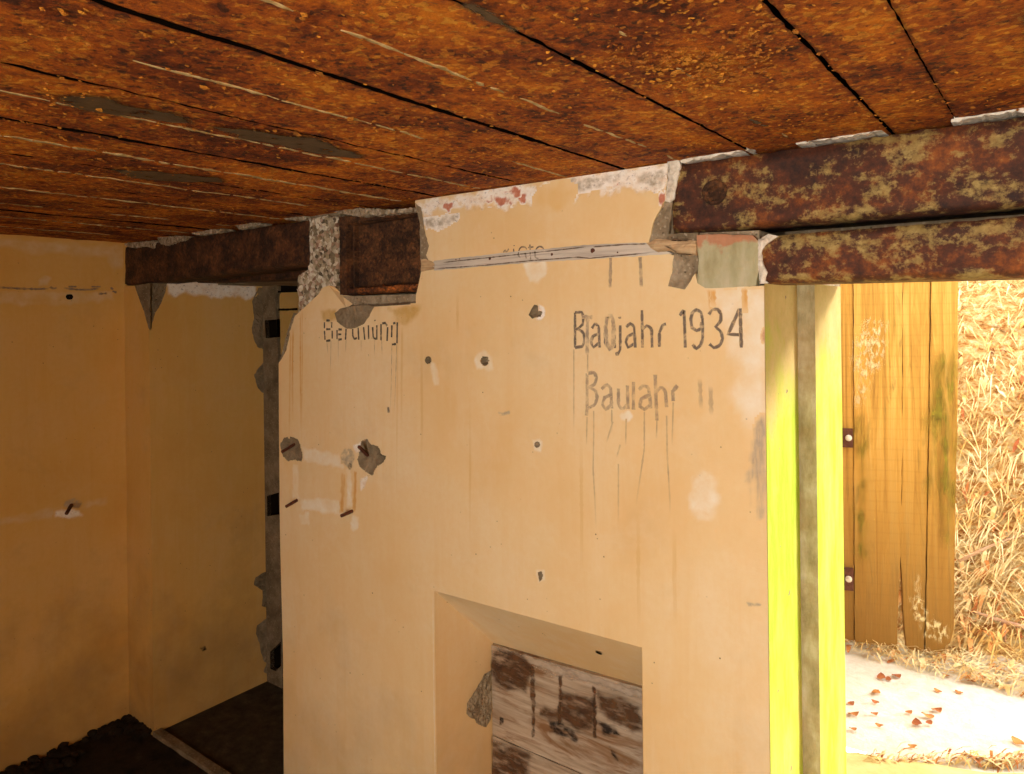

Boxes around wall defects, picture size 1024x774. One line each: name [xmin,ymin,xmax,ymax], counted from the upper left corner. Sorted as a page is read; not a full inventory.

corrosion [0,0,1018,224]
peeling [416,163,700,260]
spalling [280,215,340,361]
spalling [280,437,302,461]
spalling [357,439,386,475]
spalling [254,572,267,673]